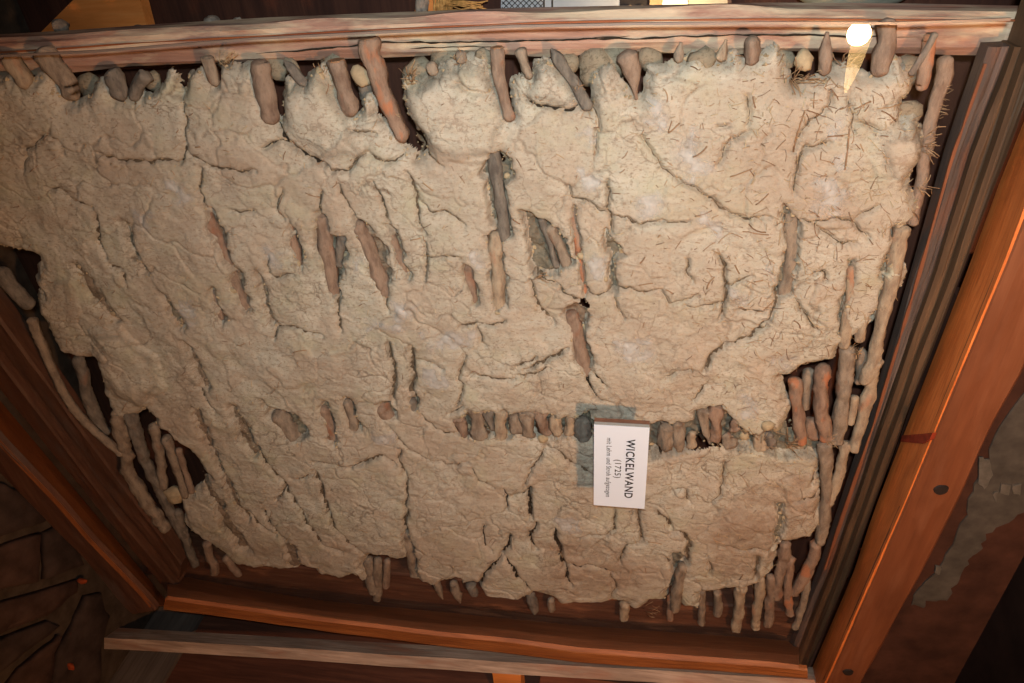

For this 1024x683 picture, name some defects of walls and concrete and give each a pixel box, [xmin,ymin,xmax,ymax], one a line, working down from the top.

crack [527,97,600,150]
crack [106,98,464,276]
spalling [483,150,512,231]
crack [643,137,878,245]
spalling [525,211,583,270]
spalling [75,264,118,318]
crack [531,255,816,399]
crack [389,320,564,433]
spalling [648,420,663,450]
spalling [684,405,818,450]
crack [254,438,713,596]
spalling [670,552,684,586]